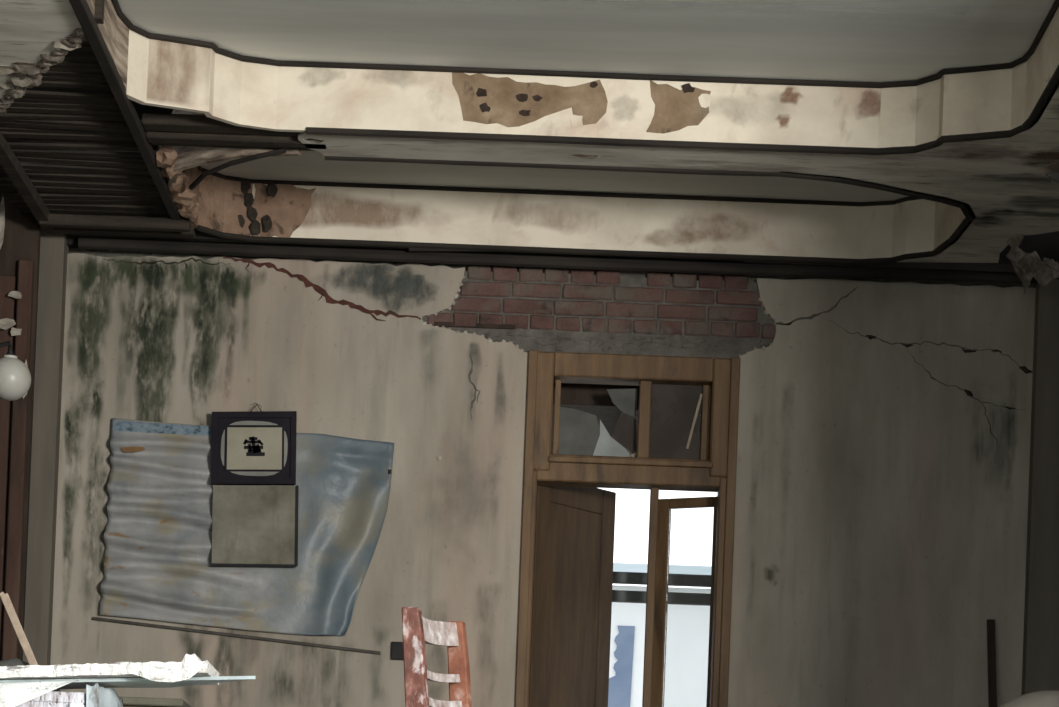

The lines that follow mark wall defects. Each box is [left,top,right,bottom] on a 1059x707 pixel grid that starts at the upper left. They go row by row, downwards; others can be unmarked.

flaking render [94,0,105,24]
peeling [452,72,608,128]
peeling [646,80,711,134]
flaking render [0,35,316,249]
peeling [0,318,22,336]
leakage [80,260,249,422]
crack [105,256,421,321]
flaking render [420,265,776,359]
crack [776,286,1033,447]